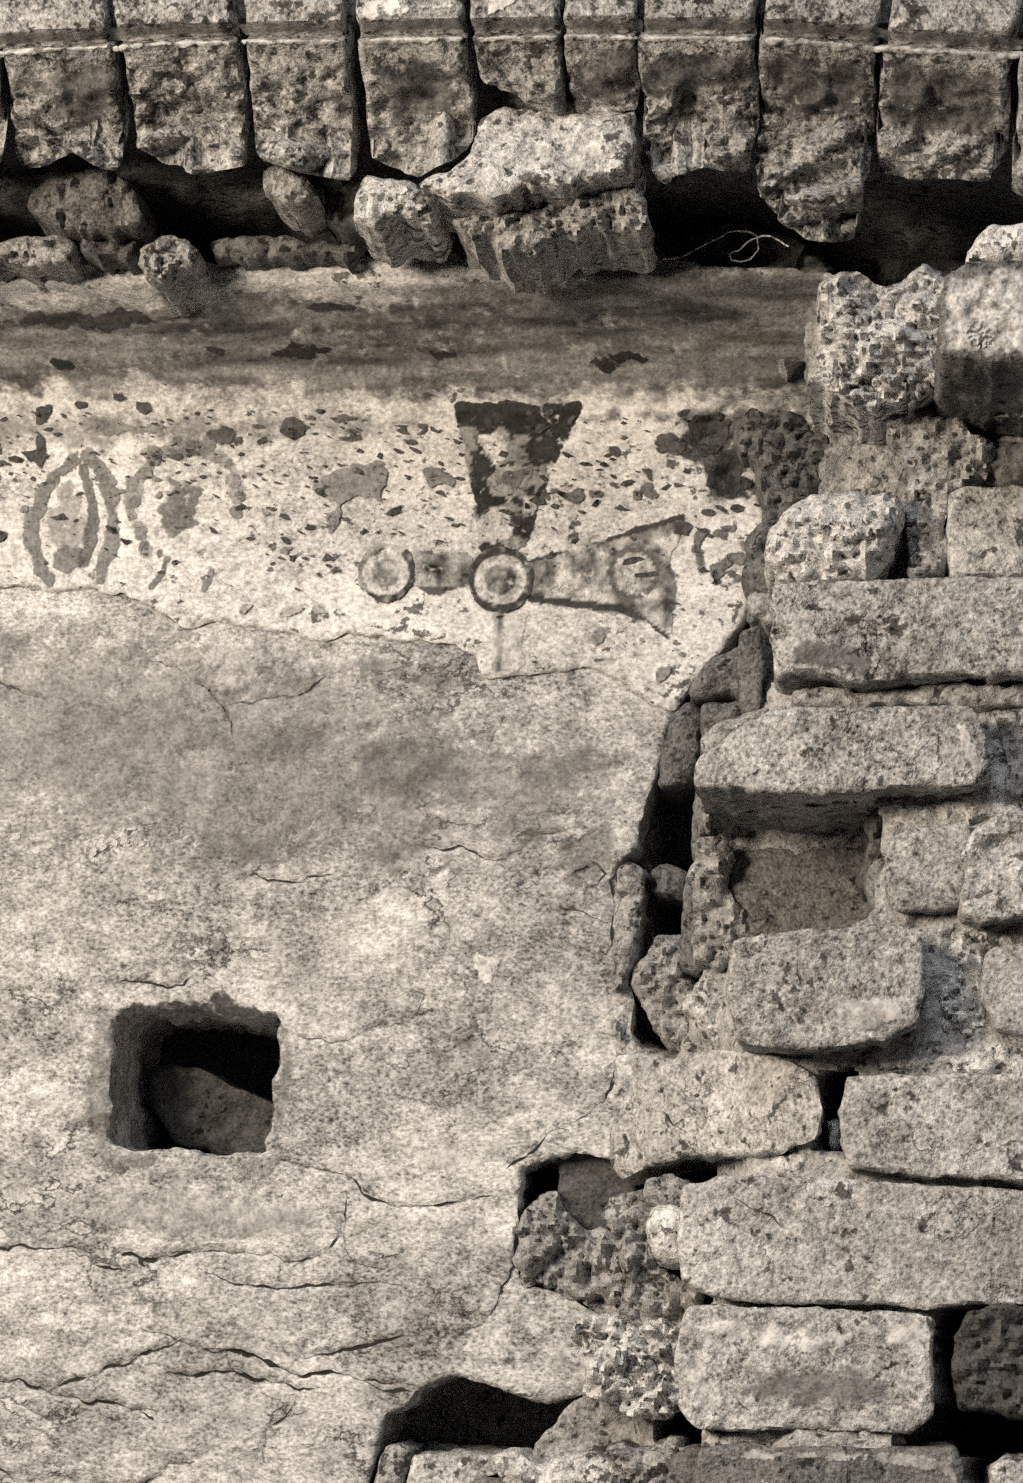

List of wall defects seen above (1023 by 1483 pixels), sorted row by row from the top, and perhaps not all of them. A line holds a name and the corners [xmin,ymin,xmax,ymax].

peeling [49,358,74,370]
peeling [2,307,174,333]
peeling [271,341,331,360]
peeling [306,302,355,312]
peeling [590,351,648,374]
spalling [966,322,995,351]
peeling [644,652,699,690]
spalling [793,640,870,675]
peeling [612,861,654,993]
crack [0,1005,630,1289]
crack [452,1223,518,1337]
crack [0,1328,414,1462]